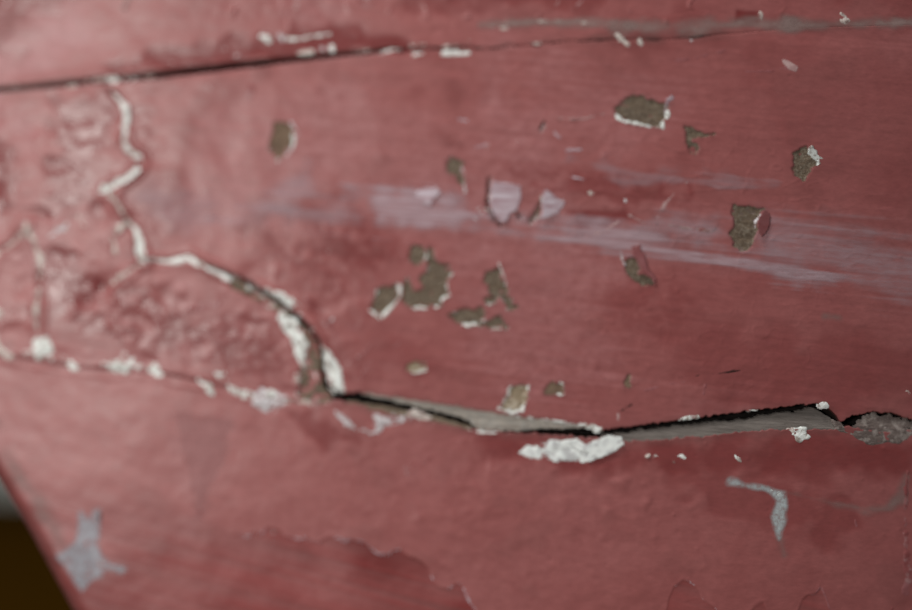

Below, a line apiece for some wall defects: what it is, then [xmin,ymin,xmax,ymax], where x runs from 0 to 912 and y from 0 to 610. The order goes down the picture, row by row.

peeling [615,94,674,129]
peeling [268,122,298,162]
peeling [446,156,467,193]
peeling [791,145,823,182]
peeling [415,187,453,205]
peeling [473,179,565,227]
crack [0,33,912,446]
peeling [729,204,771,252]
peeling [620,244,656,286]
peeling [369,245,519,330]
peeling [497,385,530,414]
peeling [518,435,624,463]